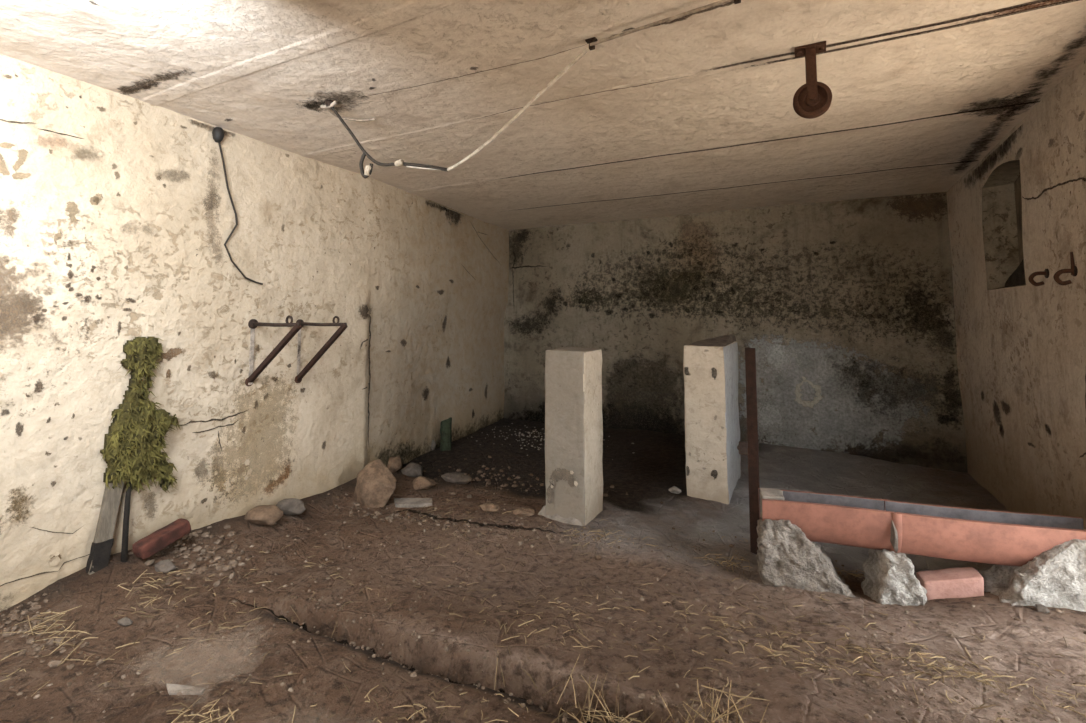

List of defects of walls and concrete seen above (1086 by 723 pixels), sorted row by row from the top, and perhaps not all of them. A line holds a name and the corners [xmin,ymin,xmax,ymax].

leakage [117,70,194,95]
leakage [296,92,367,112]
peeling [0,142,31,179]
leakage [0,208,19,235]
leakage [0,233,107,350]
leakage [509,234,962,466]
leakage [452,402,545,441]
leakage [0,489,33,523]